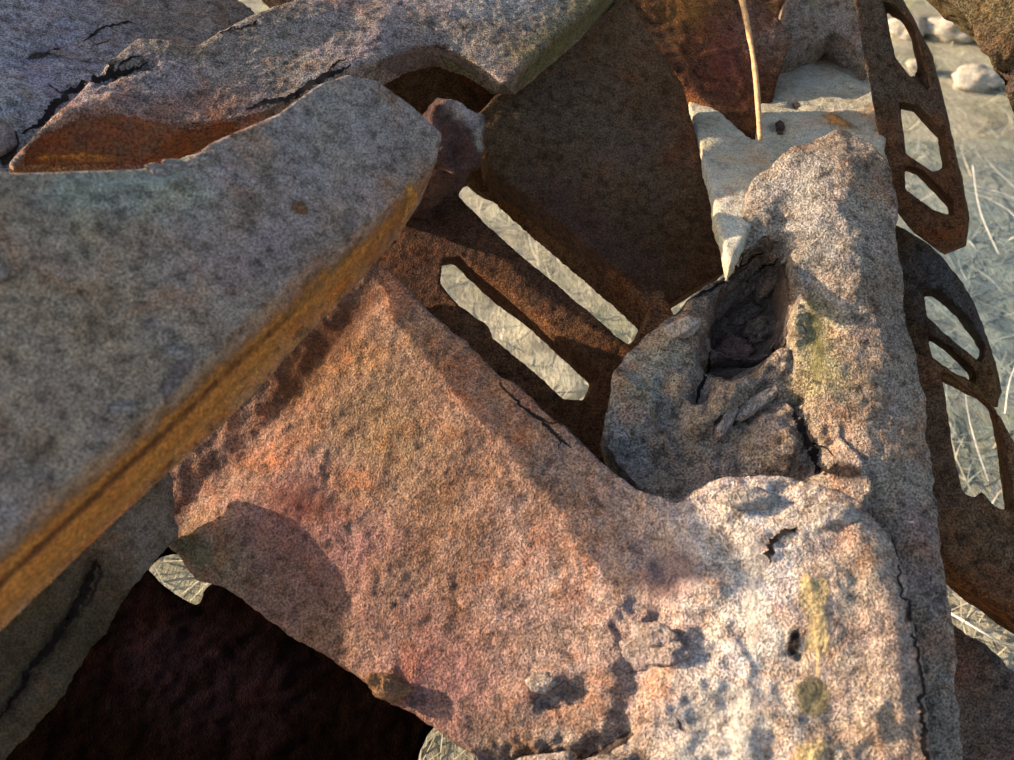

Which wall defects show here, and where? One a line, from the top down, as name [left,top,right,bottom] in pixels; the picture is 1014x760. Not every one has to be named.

crack [216,20,257,36]
crack [21,20,148,134]
crack [246,57,351,110]
crack [495,376,572,451]
crack [792,409,841,475]
crack [763,526,800,563]
crack [882,522,930,760]